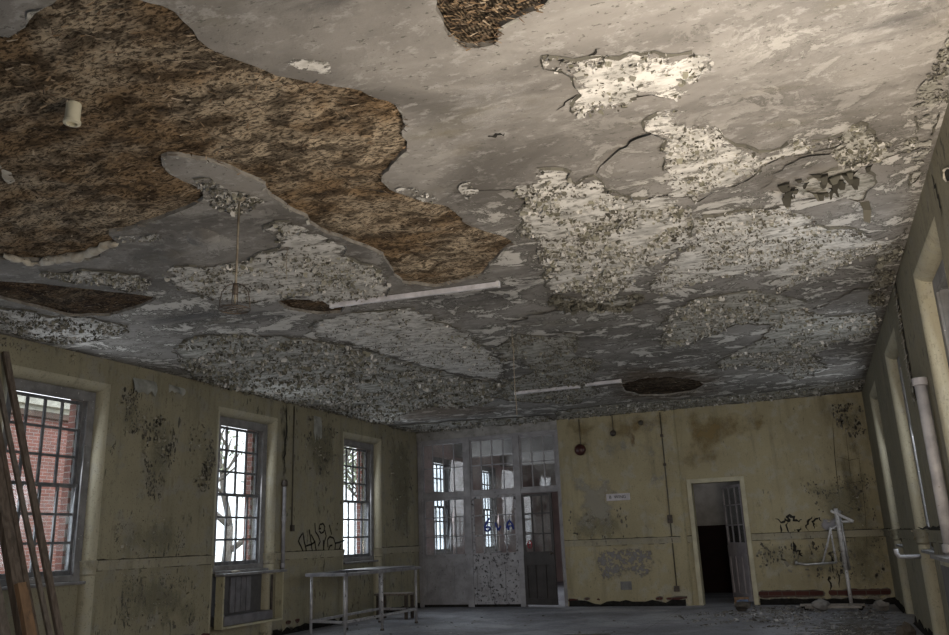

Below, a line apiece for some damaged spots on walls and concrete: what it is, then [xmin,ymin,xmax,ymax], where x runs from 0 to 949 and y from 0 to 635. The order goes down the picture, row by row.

spalling [0,0,949,475]